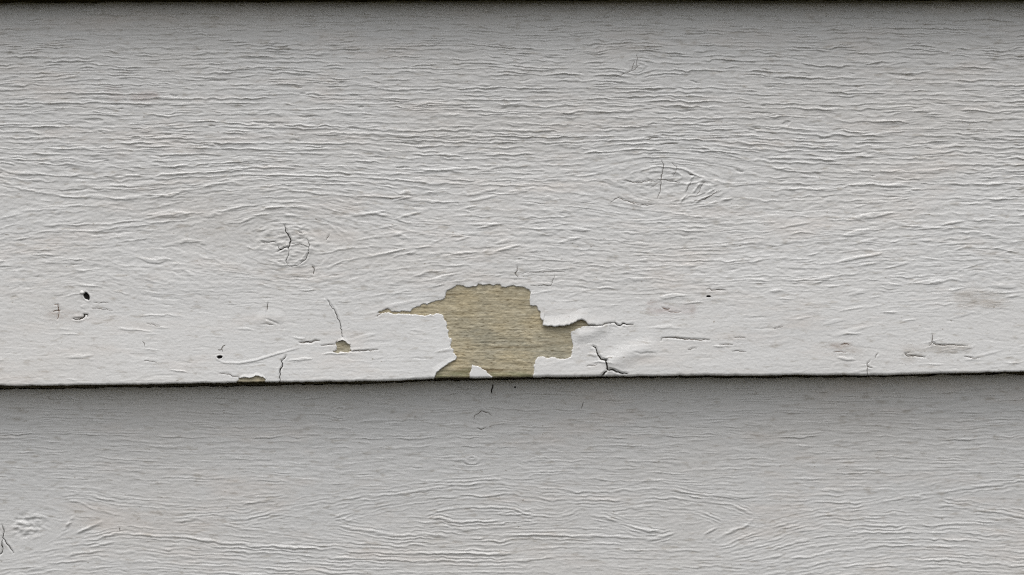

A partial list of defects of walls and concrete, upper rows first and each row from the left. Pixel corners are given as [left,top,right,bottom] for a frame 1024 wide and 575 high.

crack [263,225,329,274]
peeling [333,337,351,353]
peeling [379,284,615,379]
crack [587,346,628,376]